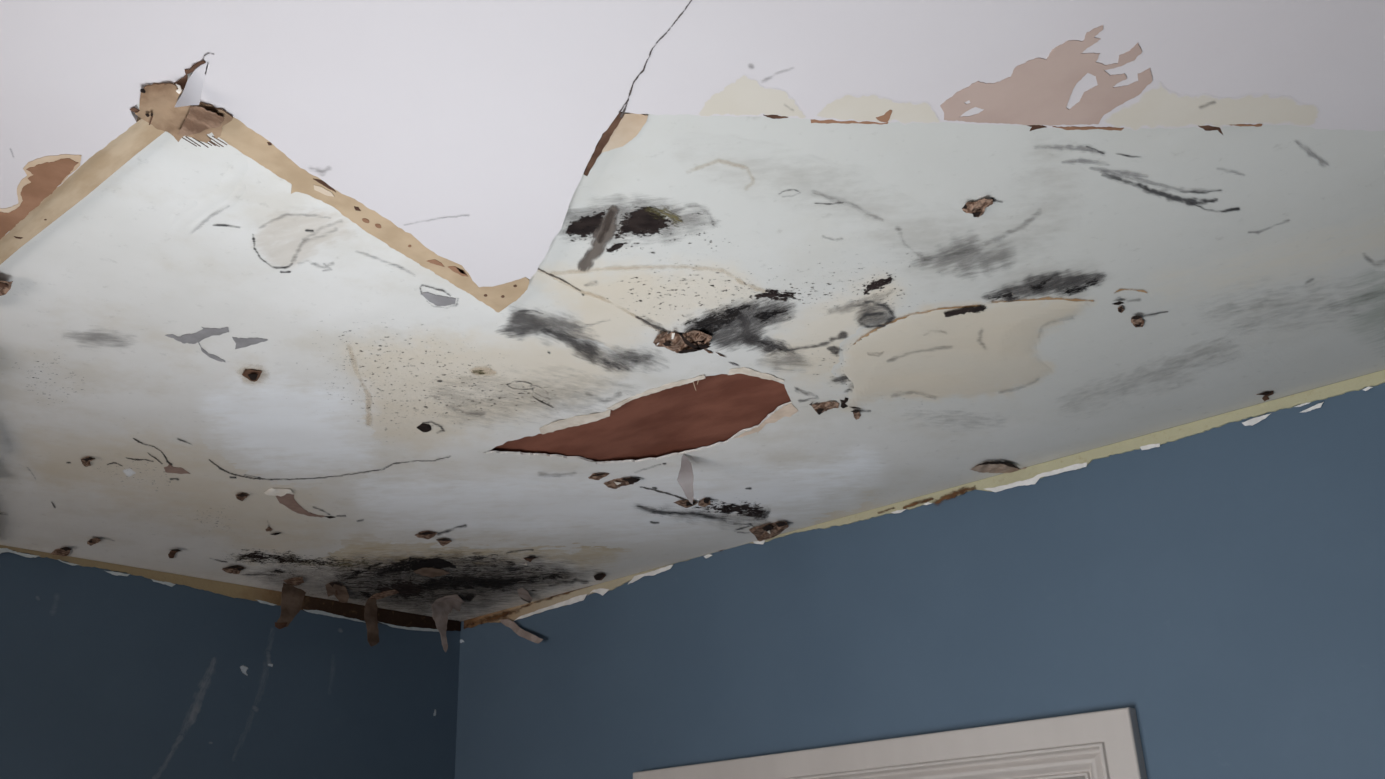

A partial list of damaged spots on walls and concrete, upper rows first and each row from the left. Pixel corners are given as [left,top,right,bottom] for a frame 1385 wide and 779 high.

crack [619,0,692,118]
peeling [697,25,1320,131]
peeling [0,154,82,240]
damp [323,131,1385,456]
crack [107,438,170,477]
peeling [164,462,190,480]
damp [6,358,640,615]
crack [209,457,449,480]
peeling [178,364,897,566]
spalling [414,568,450,578]
peeling [628,565,673,584]